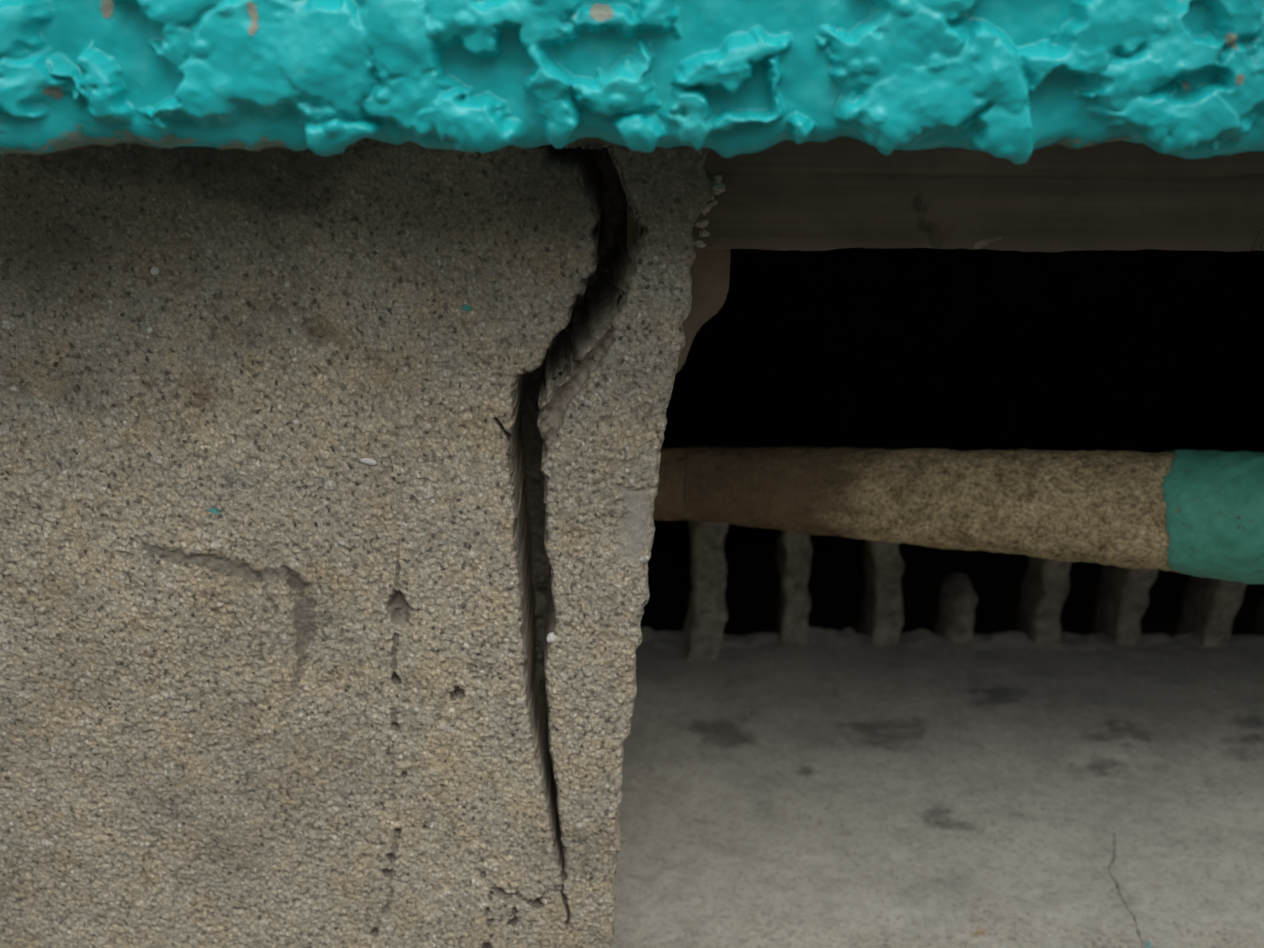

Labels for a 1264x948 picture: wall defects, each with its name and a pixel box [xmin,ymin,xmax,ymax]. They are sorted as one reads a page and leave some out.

crack [479,144,646,948]